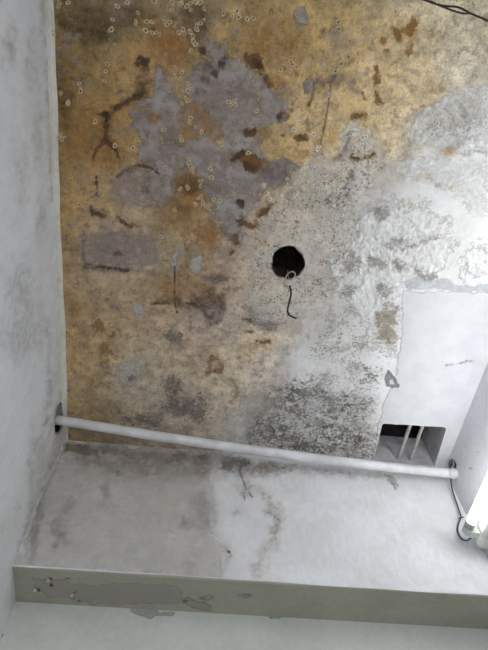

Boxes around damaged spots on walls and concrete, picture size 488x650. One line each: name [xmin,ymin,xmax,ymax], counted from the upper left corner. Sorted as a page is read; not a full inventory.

corrosion [393,16,418,55]
corrosion [373,65,381,103]
crack [93,93,143,159]
peeling [111,39,301,243]
corrosion [230,149,261,173]
crack [320,81,333,145]
corrosion [236,201,278,229]
leakage [53,0,488,459]
crack [153,267,197,314]
spalling [384,370,400,388]
leakage [19,427,276,577]
peeling [32,577,212,619]